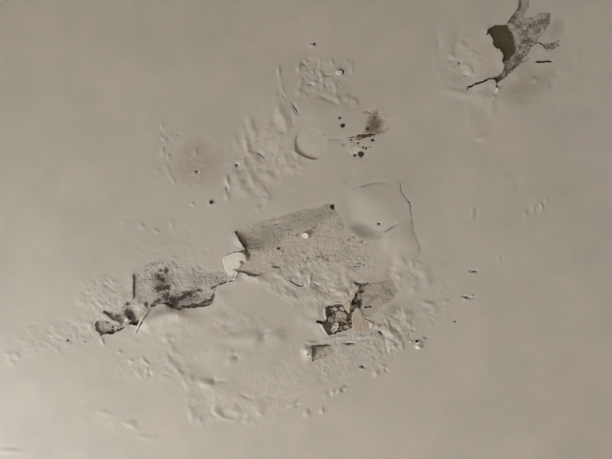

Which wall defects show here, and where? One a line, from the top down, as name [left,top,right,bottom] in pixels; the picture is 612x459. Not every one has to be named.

peeling [464,0,562,94]
crack [398,181,413,214]
peeling [92,200,373,339]
spalling [304,277,400,364]